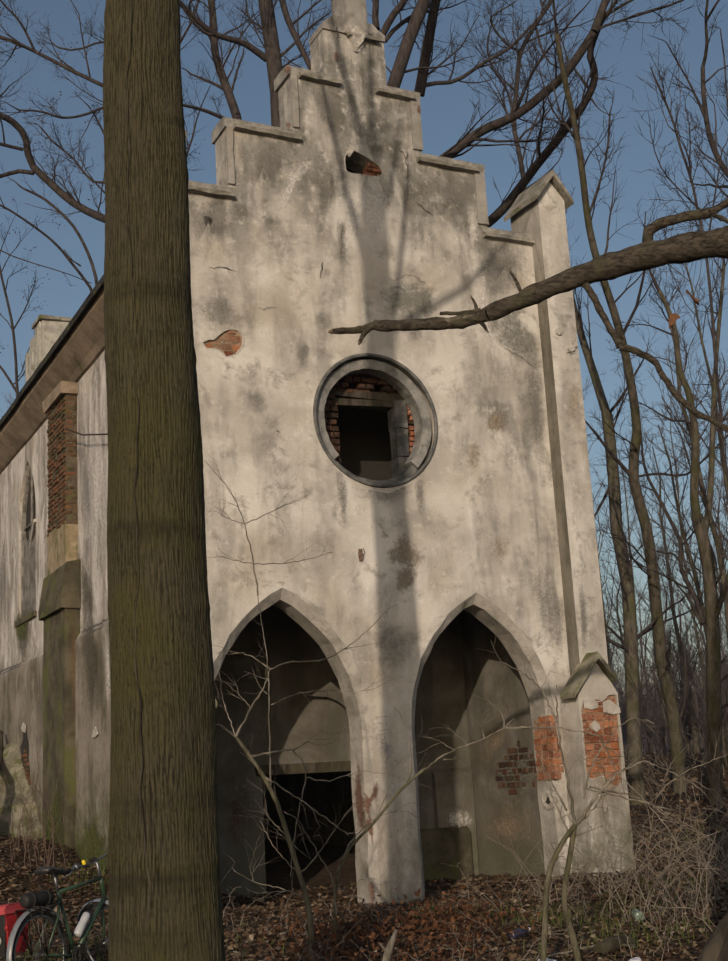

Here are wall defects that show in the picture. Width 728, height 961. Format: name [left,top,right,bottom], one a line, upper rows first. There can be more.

spalling [344,144,384,177]
spalling [202,329,245,357]
water stain [391,538,419,589]
peeling [583,699,621,732]
flaking render [20,749,31,785]